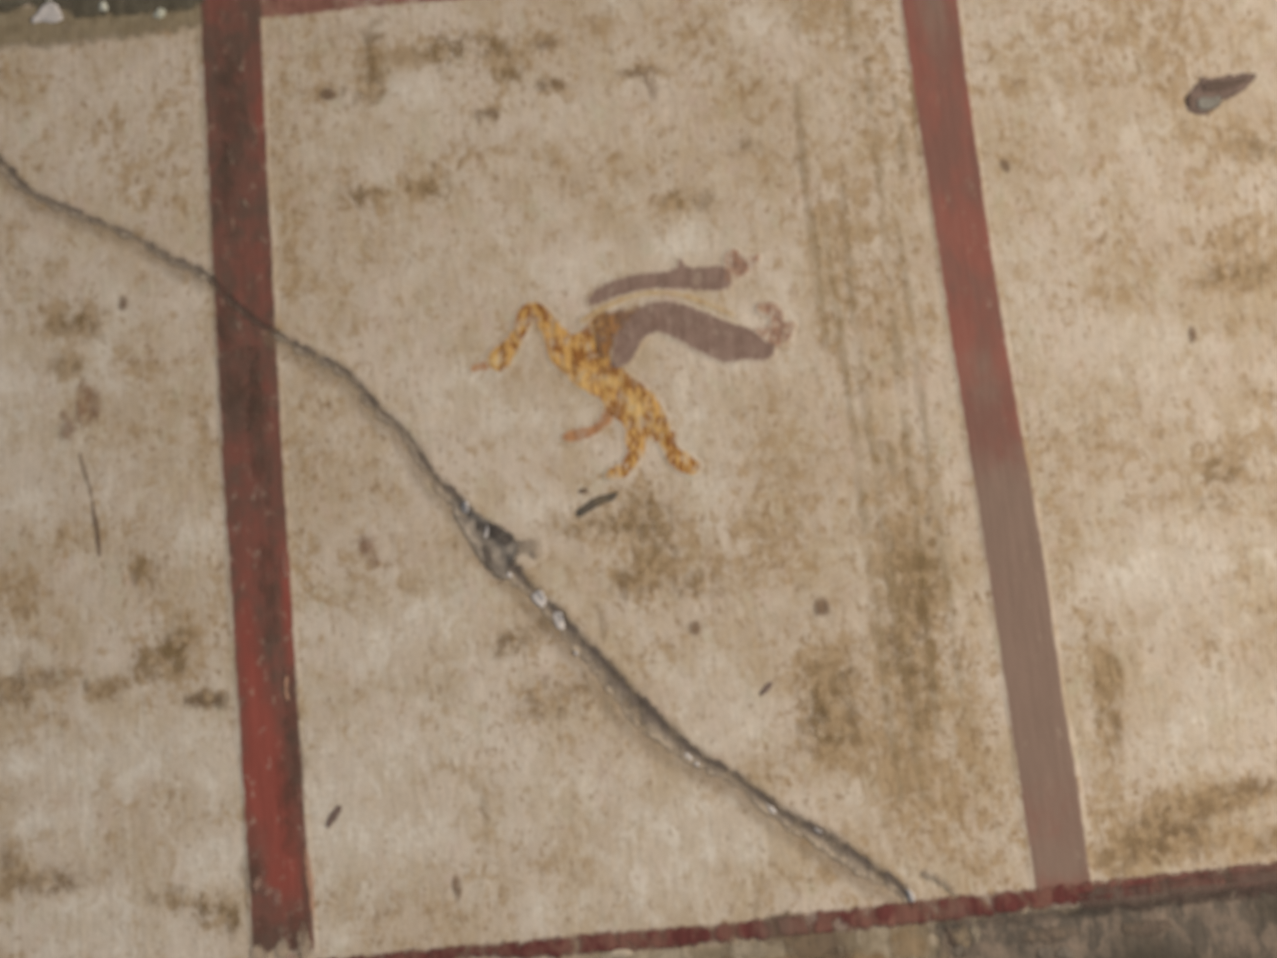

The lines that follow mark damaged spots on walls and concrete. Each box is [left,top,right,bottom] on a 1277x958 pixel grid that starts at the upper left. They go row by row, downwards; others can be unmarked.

crack [0,156,956,904]